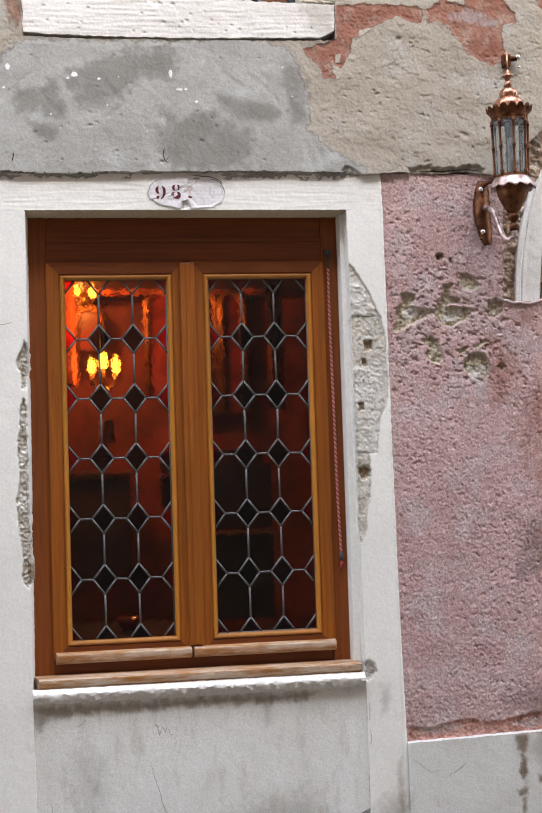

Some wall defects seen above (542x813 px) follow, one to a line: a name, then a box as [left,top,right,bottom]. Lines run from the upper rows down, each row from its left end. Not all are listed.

peeling [303,0,517,79]
peeling [16,341,35,589]
peeling [348,264,479,544]
spalling [457,340,506,383]